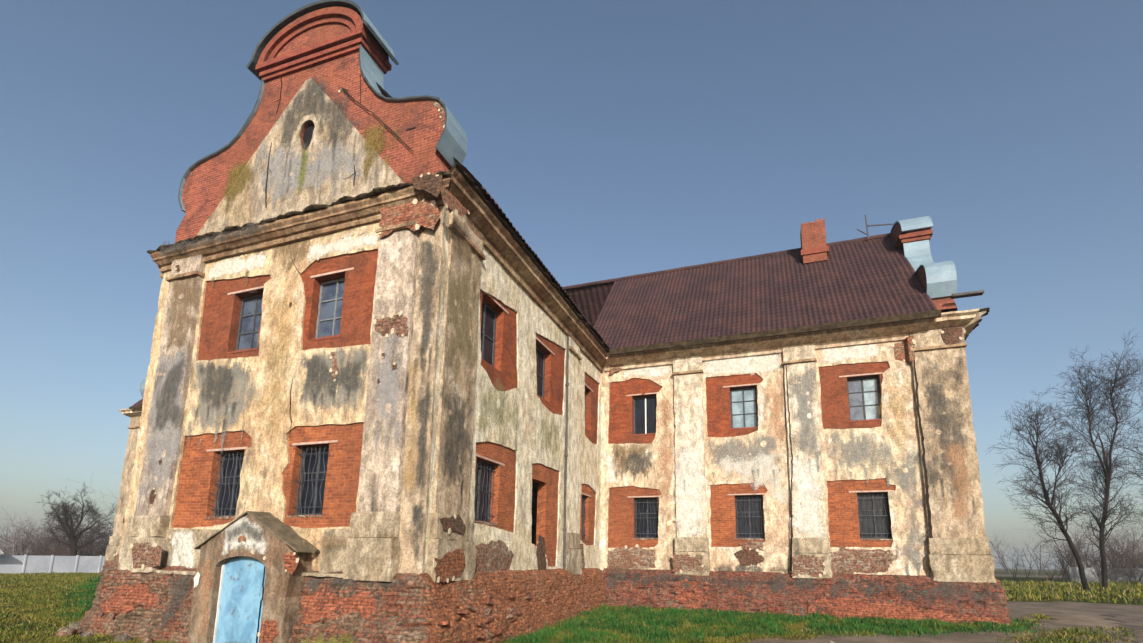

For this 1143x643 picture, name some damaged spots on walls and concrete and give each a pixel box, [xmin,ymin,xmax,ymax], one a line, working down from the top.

leakage [161,79,369,257]
leakage [275,239,310,269]
flaking render [289,172,470,382]
flaking render [98,431,266,620]
leakage [139,275,255,500]
leakage [300,338,398,446]
leakage [412,243,472,558]
flaking render [433,441,516,583]
flaking render [579,364,672,570]
flaking render [671,447,897,609]
flaking render [819,335,916,429]
leakage [789,358,998,609]